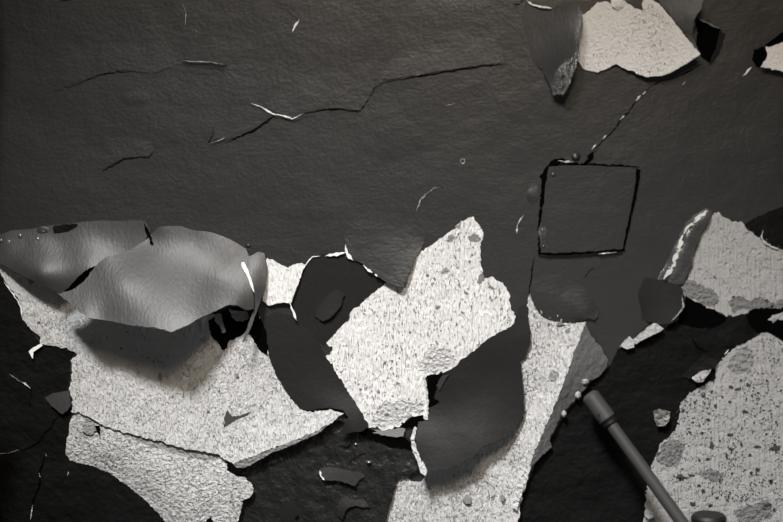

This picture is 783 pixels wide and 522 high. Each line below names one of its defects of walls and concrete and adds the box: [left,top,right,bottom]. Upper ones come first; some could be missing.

crack [208,117,273,142]
crack [310,64,502,113]
crack [529,65,699,296]
spalling [577,0,720,77]
spalling [752,32,783,72]
spalling [679,212,783,329]
spalling [0,258,345,522]
peeling [319,467,365,486]
spalling [326,216,516,451]
spalling [385,295,608,522]
spalling [643,486,673,522]
spalling [651,332,783,522]